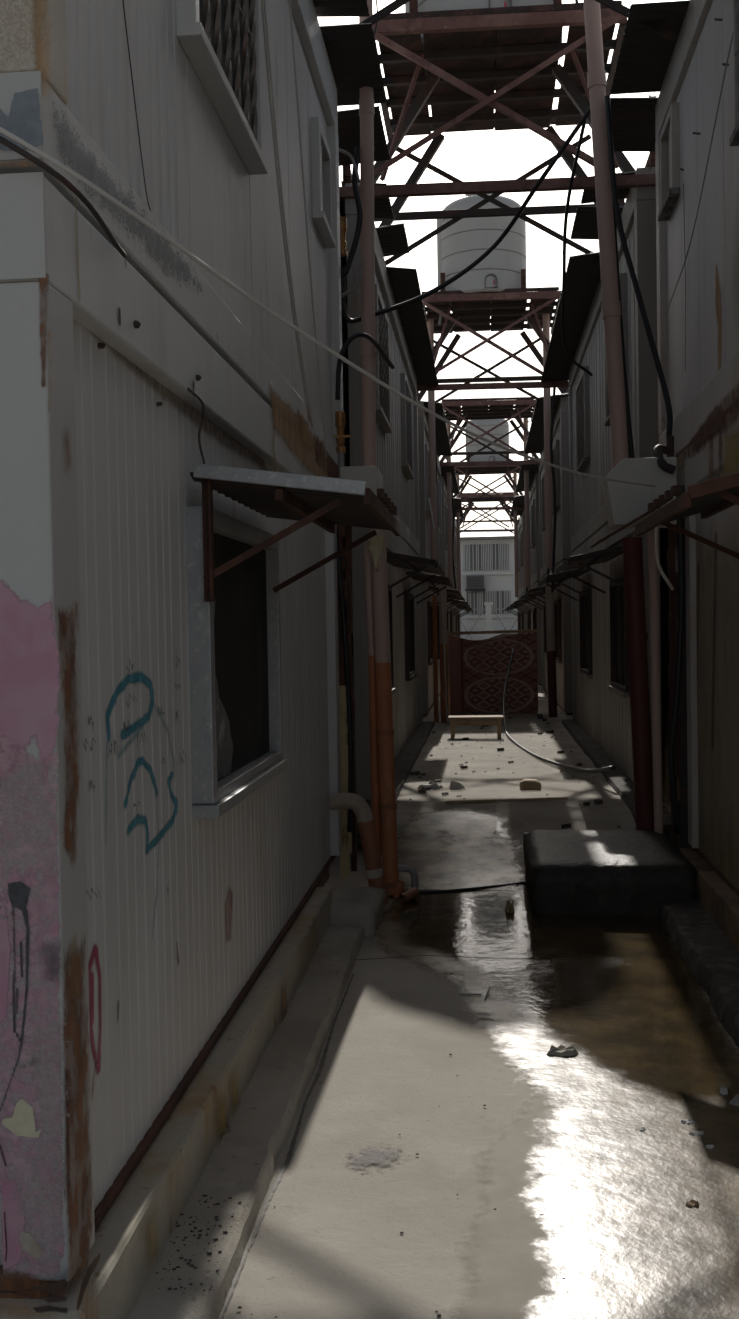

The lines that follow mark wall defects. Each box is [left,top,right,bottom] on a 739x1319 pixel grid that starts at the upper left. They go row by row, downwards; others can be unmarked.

rust [271,390,338,478]
rust [674,383,739,479]
rust [59,606,79,856]
peeling [0,736,100,1313]
rust [64,953,93,1274]
damp [376,810,739,1319]
rust [0,1271,64,1299]